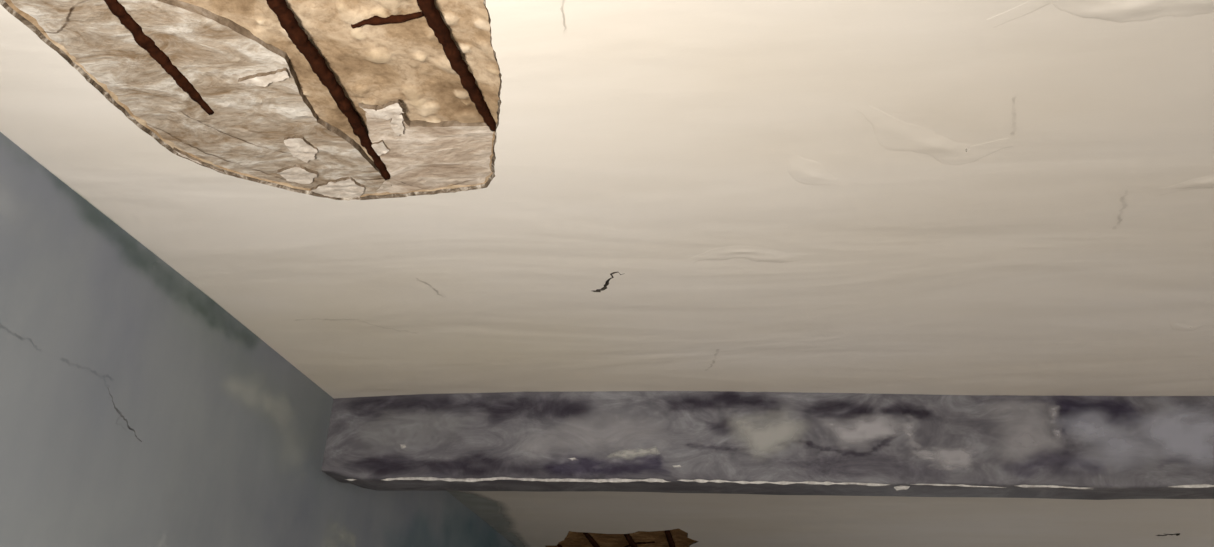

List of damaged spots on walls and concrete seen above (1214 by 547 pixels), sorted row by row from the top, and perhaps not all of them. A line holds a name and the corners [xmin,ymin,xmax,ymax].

spalling [0,0,502,201]
crack [108,388,142,442]
spalling [544,528,699,547]